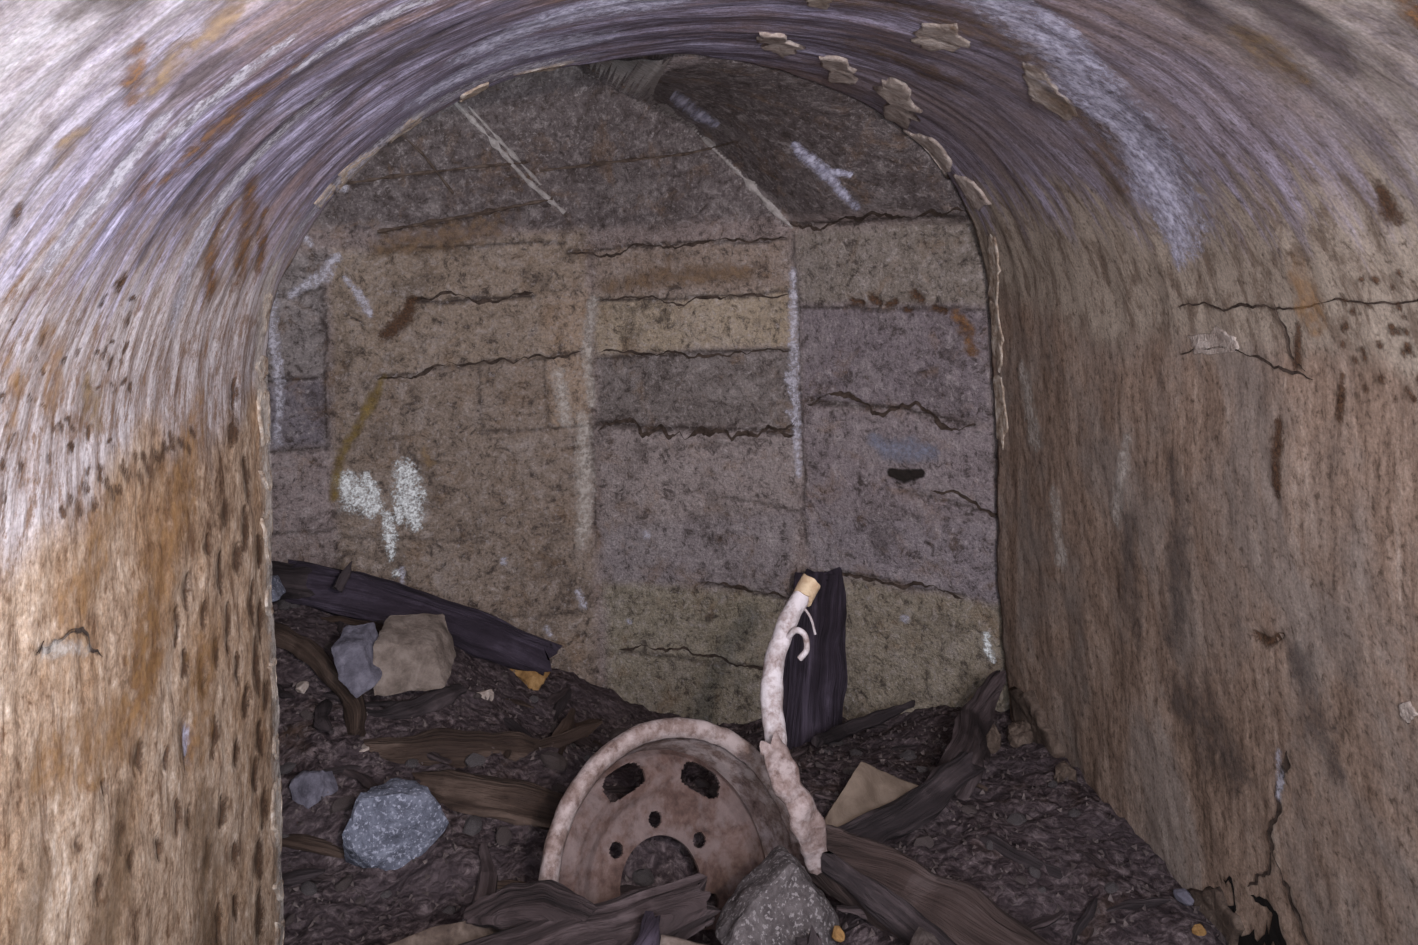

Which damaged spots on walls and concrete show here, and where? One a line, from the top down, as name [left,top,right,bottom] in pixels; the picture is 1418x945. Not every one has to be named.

rust [121,5,241,106]
peeling [911,23,971,53]
rust [128,53,311,201]
peeling [756,32,991,211]
rust [203,178,269,301]
crack [415,291,533,305]
crack [1178,298,1418,380]
crack [598,391,976,441]
crack [36,626,103,657]
crack [1223,751,1309,945]